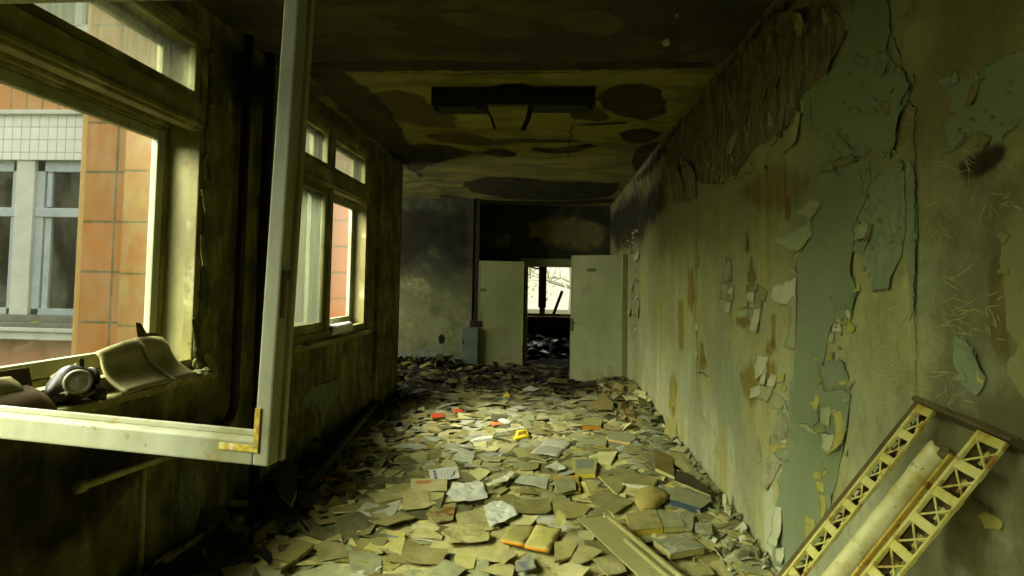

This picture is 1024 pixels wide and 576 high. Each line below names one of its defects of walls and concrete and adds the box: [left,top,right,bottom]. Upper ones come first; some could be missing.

peeling [719,0,913,573]
crack [861,2,918,393]
peeling [953,335,986,396]
leakage [960,146,1005,175]